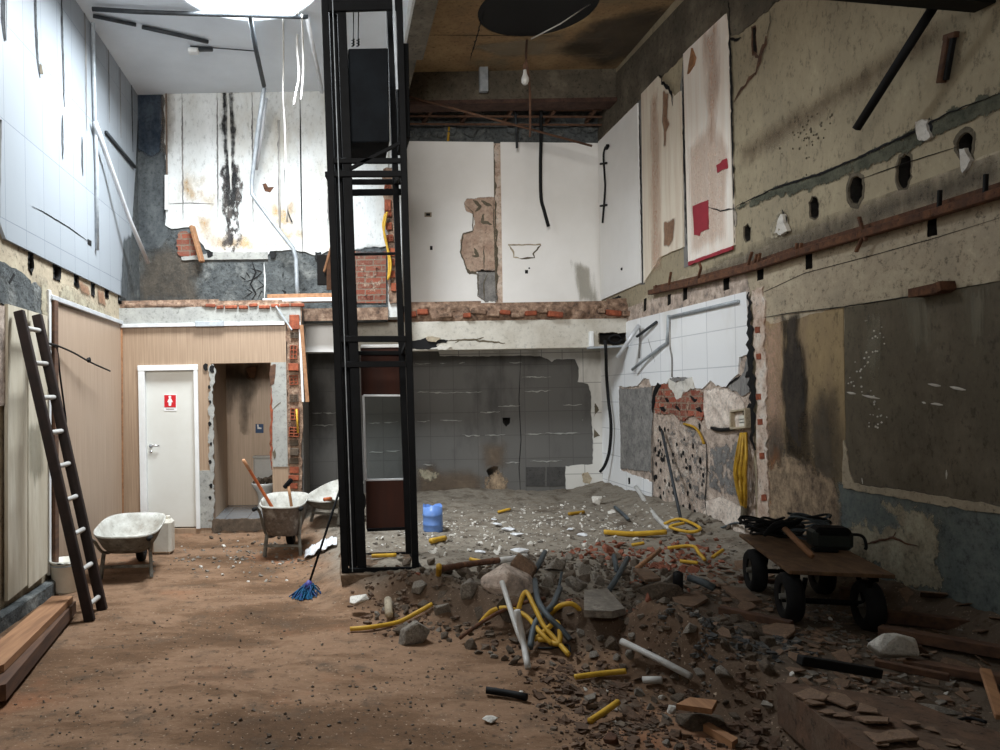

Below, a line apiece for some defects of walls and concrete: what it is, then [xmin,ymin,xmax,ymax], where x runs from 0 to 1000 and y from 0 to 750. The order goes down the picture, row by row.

damp [220,93,243,252]
crack [659,3,1000,261]
peeling [915,118,935,143]
peeling [959,148,974,173]
peeling [60,281,112,317]
flaking render [176,231,196,257]
crack [240,262,266,299]
peeling [460,197,498,302]
flaking render [526,467,565,486]
flaking render [619,353,761,534]
peeling [759,440,1000,592]
damp [768,315,1000,615]